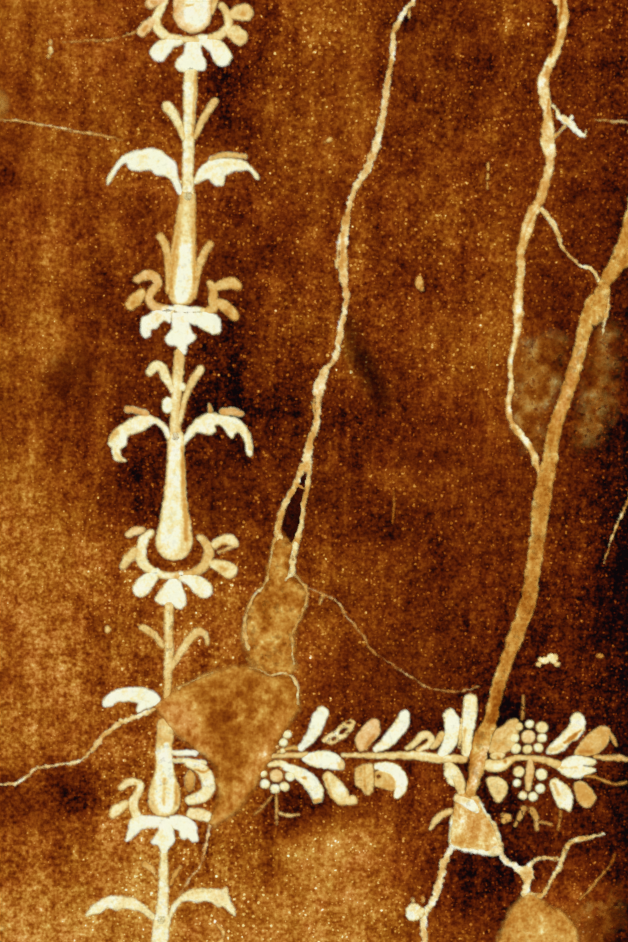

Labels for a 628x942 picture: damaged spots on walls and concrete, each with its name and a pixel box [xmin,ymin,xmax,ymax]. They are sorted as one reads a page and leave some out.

crack [71,31,137,43]
crack [5,119,118,140]
crack [274,0,415,546]
crack [309,0,628,797]
crack [0,708,156,786]
crack [420,845,455,942]
peeling [498,894,578,942]
crack [500,833,615,900]